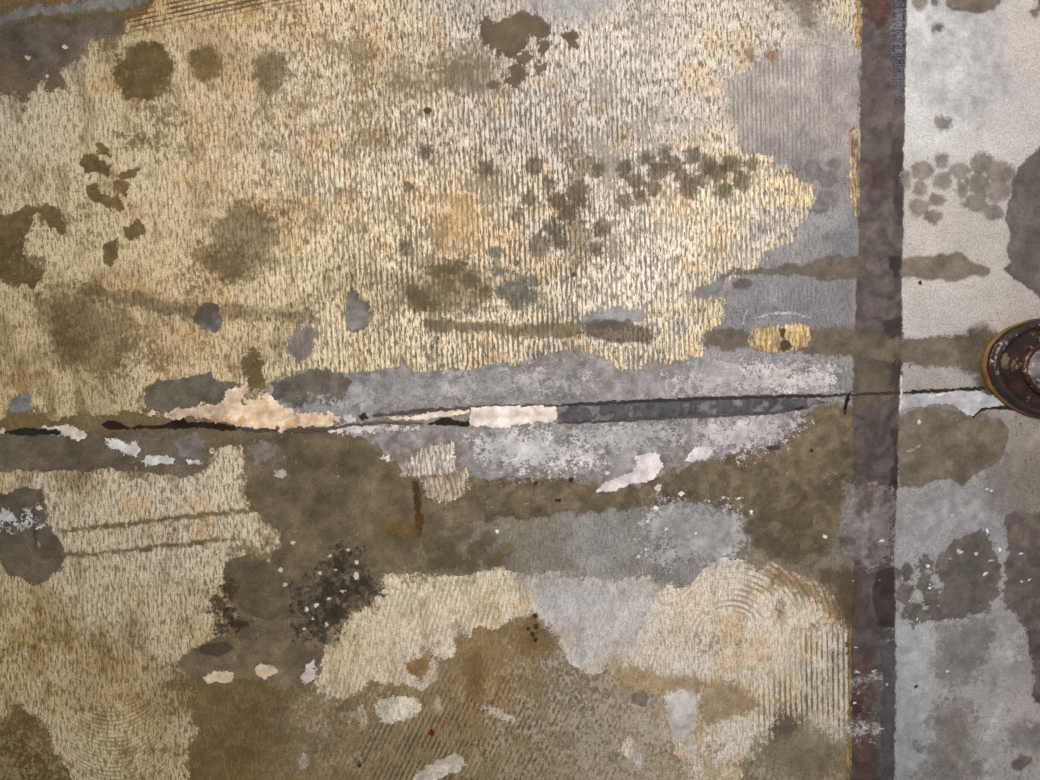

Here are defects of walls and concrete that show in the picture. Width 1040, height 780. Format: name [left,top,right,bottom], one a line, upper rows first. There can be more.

water stain [487,37,552,89]
water stain [562,27,579,50]
peeling [79,142,140,211]
peeling [0,203,65,290]
water stain [900,147,1040,297]
crack [4,427,61,436]
peeling [0,424,222,479]
crack [101,386,1013,433]
peeling [0,486,66,586]
peeling [144,320,855,692]
water stain [267,531,389,648]
water stain [893,509,1040,780]